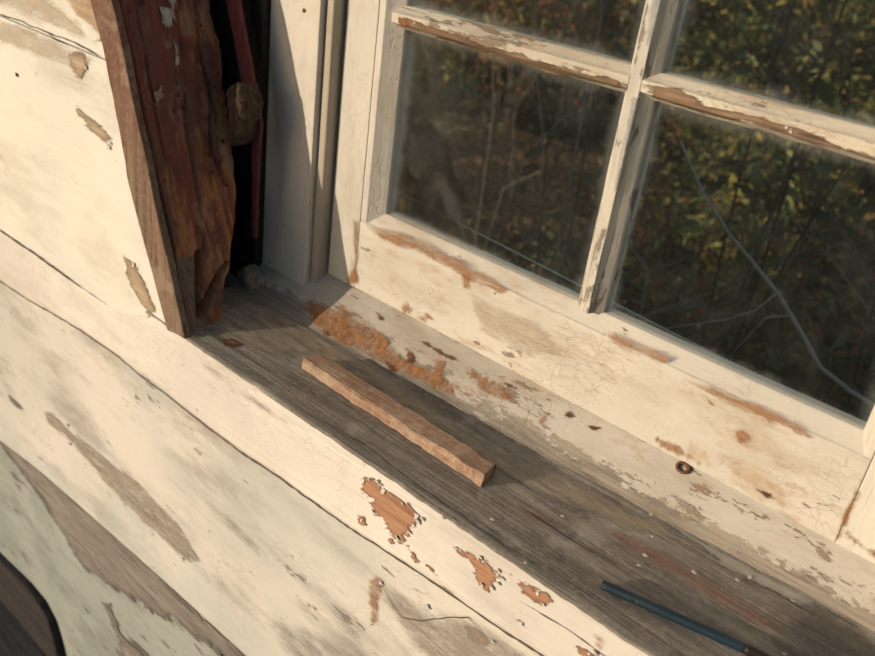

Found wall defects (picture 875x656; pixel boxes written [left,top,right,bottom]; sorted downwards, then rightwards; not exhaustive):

crack [0,14,101,58]
peeling [75,105,111,150]
peeling [652,85,875,160]
peeling [123,257,155,318]
peeling [46,413,198,561]
crack [0,281,544,656]
peeling [0,441,244,656]
peeling [357,476,436,576]
peeling [453,546,553,607]
crack [518,504,598,556]
peeling [381,585,513,656]
crack [520,601,605,656]